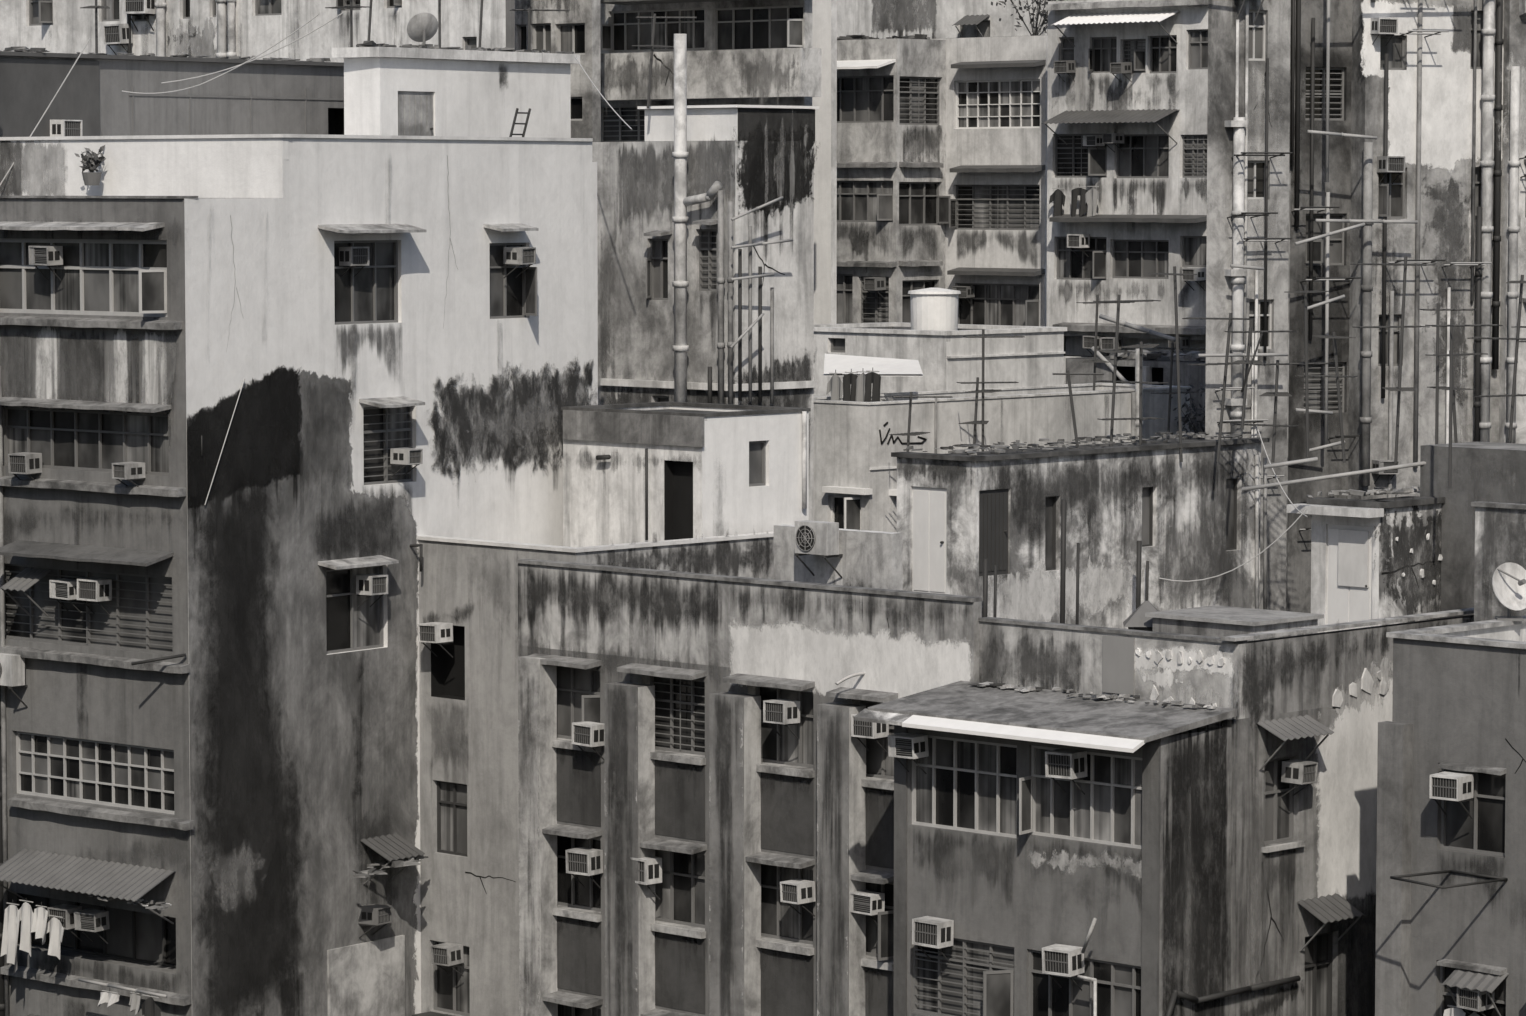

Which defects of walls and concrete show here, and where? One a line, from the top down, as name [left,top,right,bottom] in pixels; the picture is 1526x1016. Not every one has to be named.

peeling [1360,0,1526,173]
damp [842,225,885,261]
damp [957,231,1037,264]
damp [430,122,818,478]
damp [341,326,395,366]
damp [1,326,177,446]
damp [4,514,35,556]
damp [518,533,774,656]
damp [833,582,942,630]
damp [187,366,346,1016]
peeling [1134,646,1235,719]
damp [9,954,174,1006]